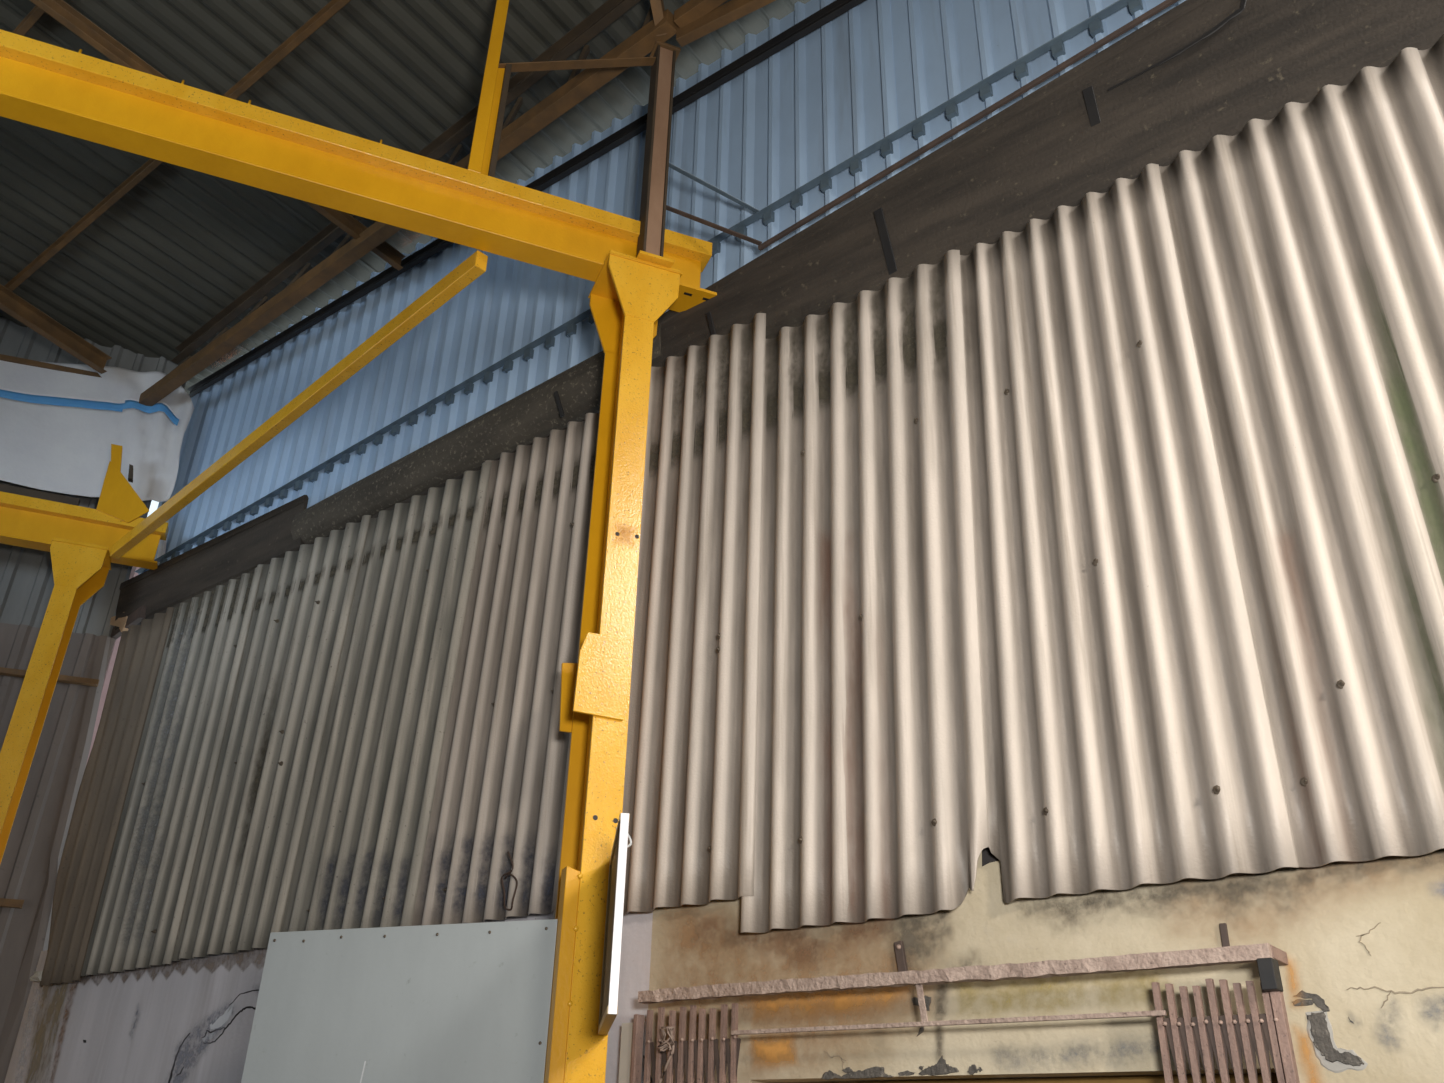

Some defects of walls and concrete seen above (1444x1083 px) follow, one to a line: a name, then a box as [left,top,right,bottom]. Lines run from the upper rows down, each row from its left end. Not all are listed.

crack [1346,922,1444,1008]
crack [168,989,259,1083]
spalling [821,1055,982,1080]
spalling [1292,990,1368,1073]